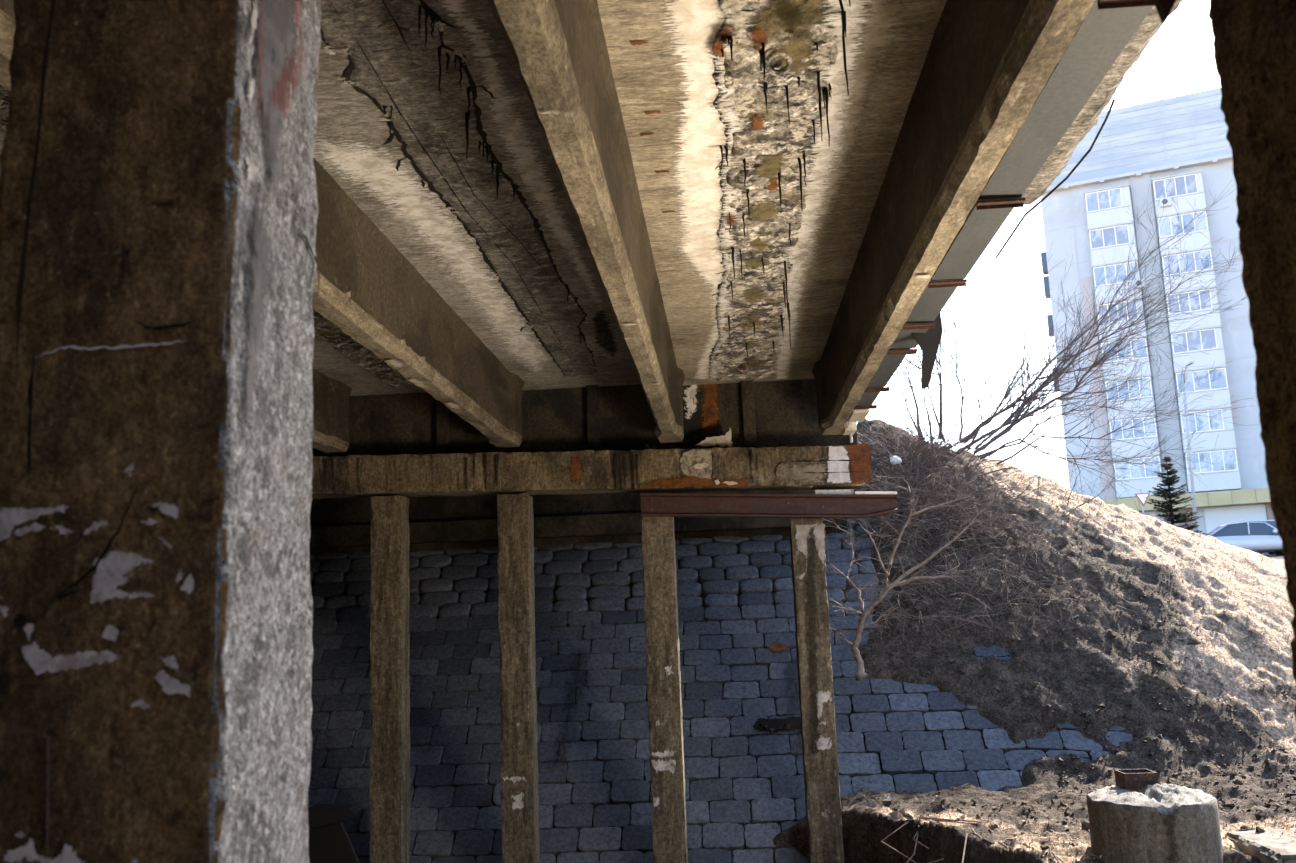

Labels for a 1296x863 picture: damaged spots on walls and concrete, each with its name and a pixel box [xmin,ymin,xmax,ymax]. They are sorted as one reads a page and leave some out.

water stain [794,0,908,317]
crack [320,0,604,377]
spalling [705,0,873,381]
rust [701,384,720,428]
rust [641,475,750,490]
rust [845,443,872,484]
peeling [0,505,109,541]
peeling [141,501,182,549]
peeling [90,551,154,604]
peeling [175,569,194,594]
peeling [20,623,123,675]
peeling [154,655,191,697]